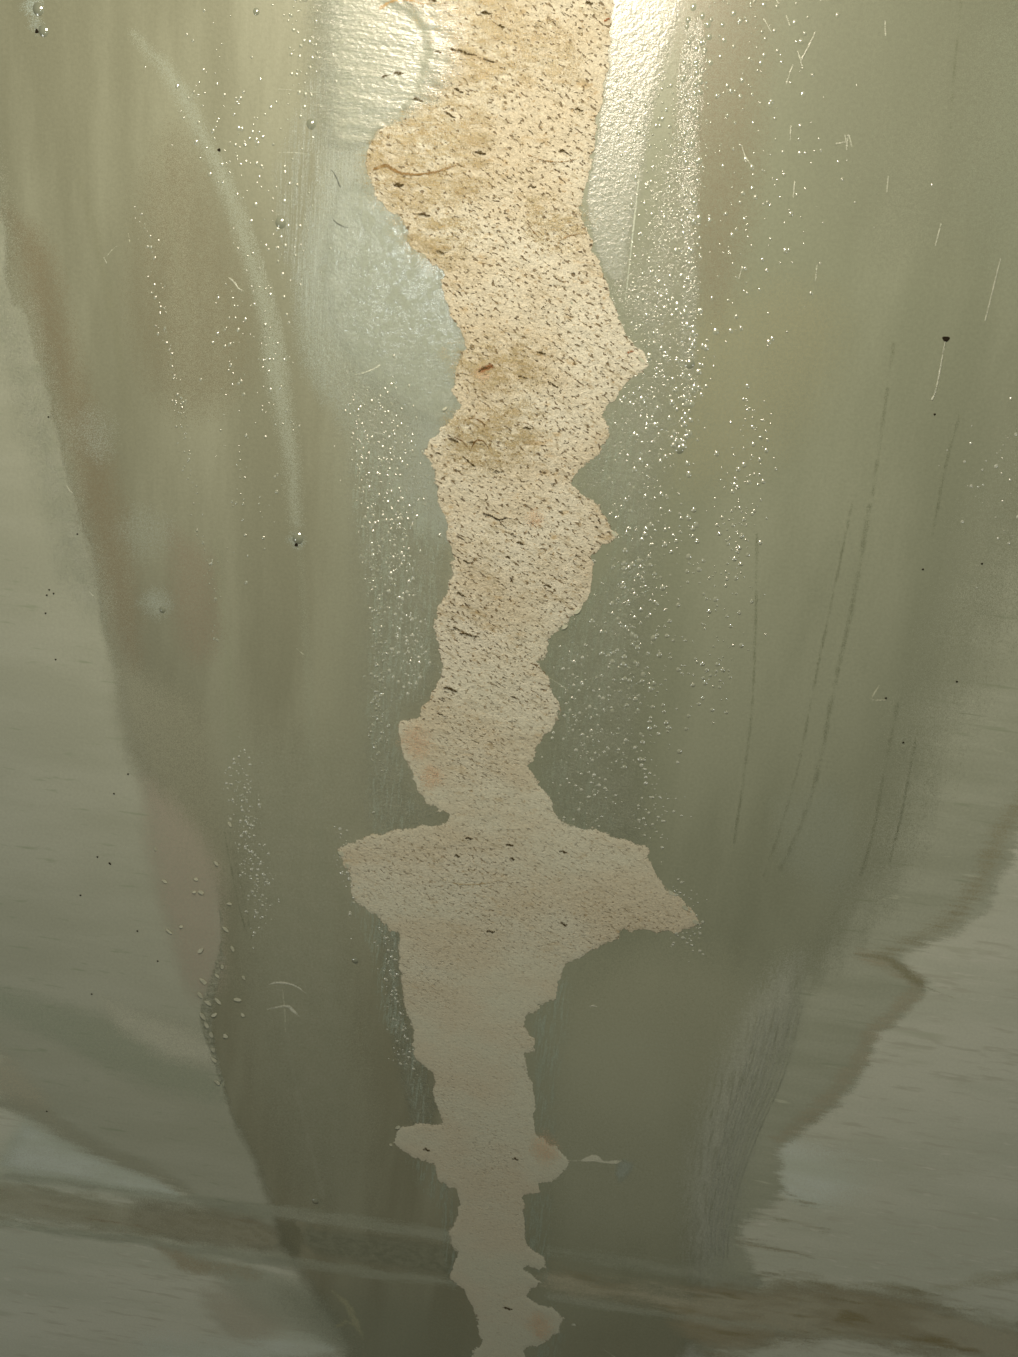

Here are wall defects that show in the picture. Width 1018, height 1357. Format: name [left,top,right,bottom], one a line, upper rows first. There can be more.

leakage [0,0,483,1357]
peeling [337,0,701,1357]
leakage [522,0,1018,1357]